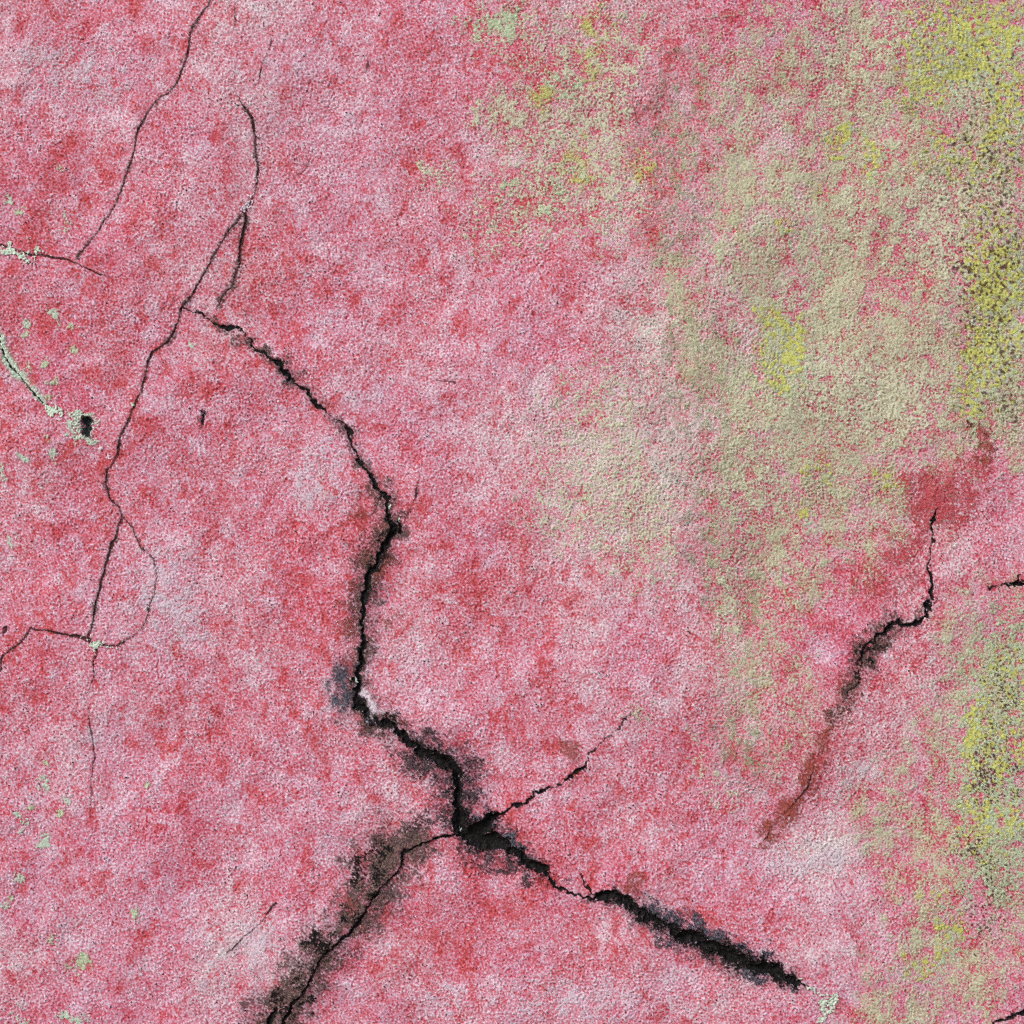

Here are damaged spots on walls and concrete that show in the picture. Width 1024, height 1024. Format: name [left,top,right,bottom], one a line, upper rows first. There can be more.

crack [0,0,236,276]
crack [0,98,839,1024]
crack [756,508,938,849]
crack [988,574,1024,591]